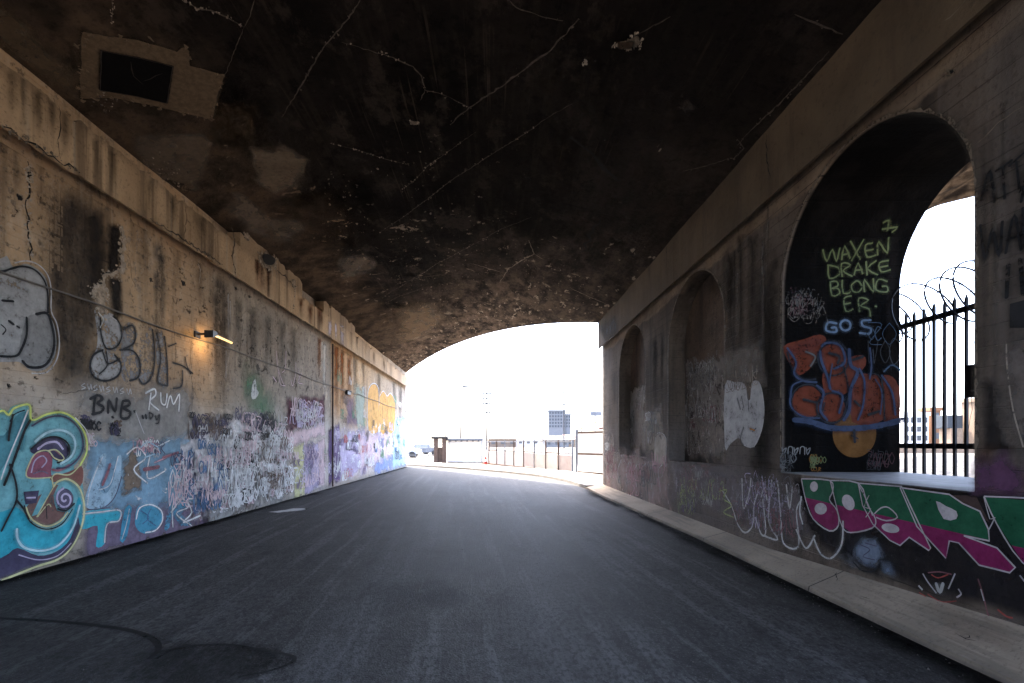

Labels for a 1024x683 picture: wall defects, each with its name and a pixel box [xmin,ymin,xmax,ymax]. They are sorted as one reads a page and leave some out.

crack [282,0,579,233]
spalling [612,31,644,51]
crack [23,158,34,261]
damp [49,195,122,380]